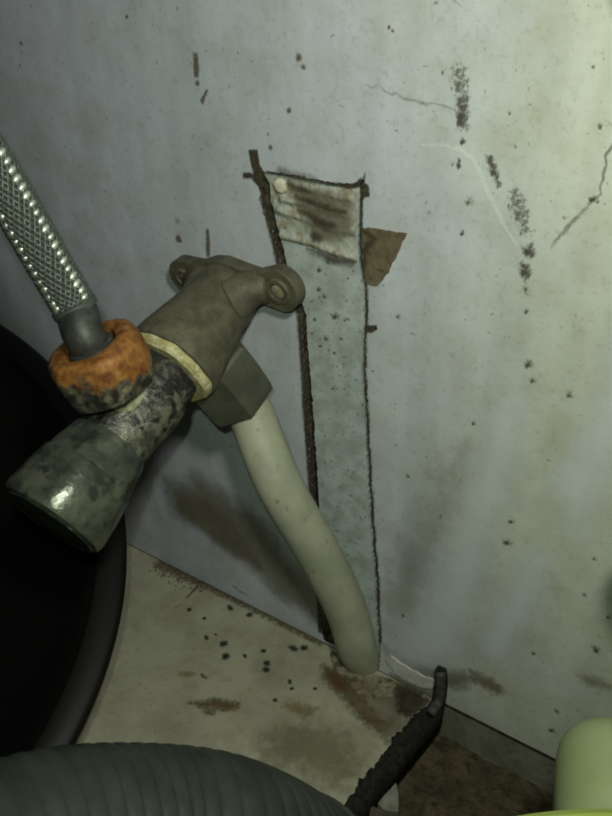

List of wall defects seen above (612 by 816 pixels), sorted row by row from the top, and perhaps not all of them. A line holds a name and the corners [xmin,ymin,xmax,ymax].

water stain [451,68,469,128]
water stain [488,156,501,187]
peeling [270,177,407,286]
water stain [508,189,529,235]
water stain [521,243,535,292]